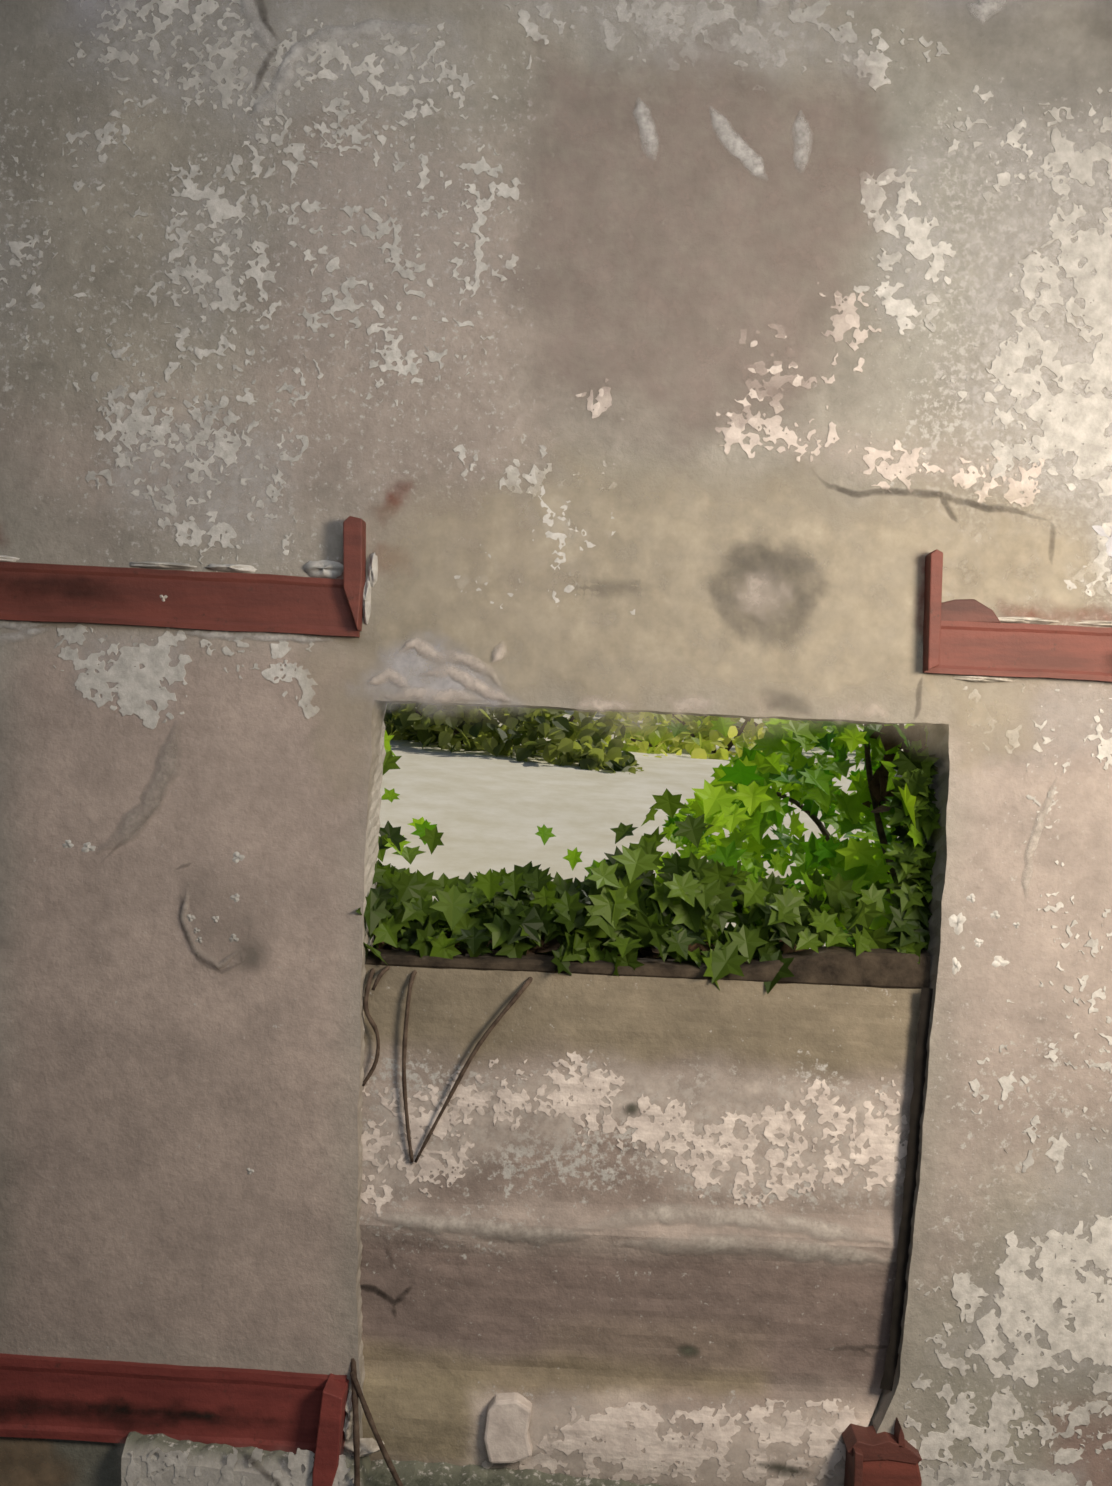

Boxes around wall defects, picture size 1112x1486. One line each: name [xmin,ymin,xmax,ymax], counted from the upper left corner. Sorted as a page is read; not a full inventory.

peeling [0,0,523,572]
peeling [575,378,612,419]
peeling [715,69,1112,597]
peeling [453,431,596,603]
crack [840,489,998,510]
peeling [53,624,320,730]
spalling [952,957,961,975]
spalling [948,894,1010,967]
peeling [969,892,1112,1114]
peeling [904,1107,1112,1486]